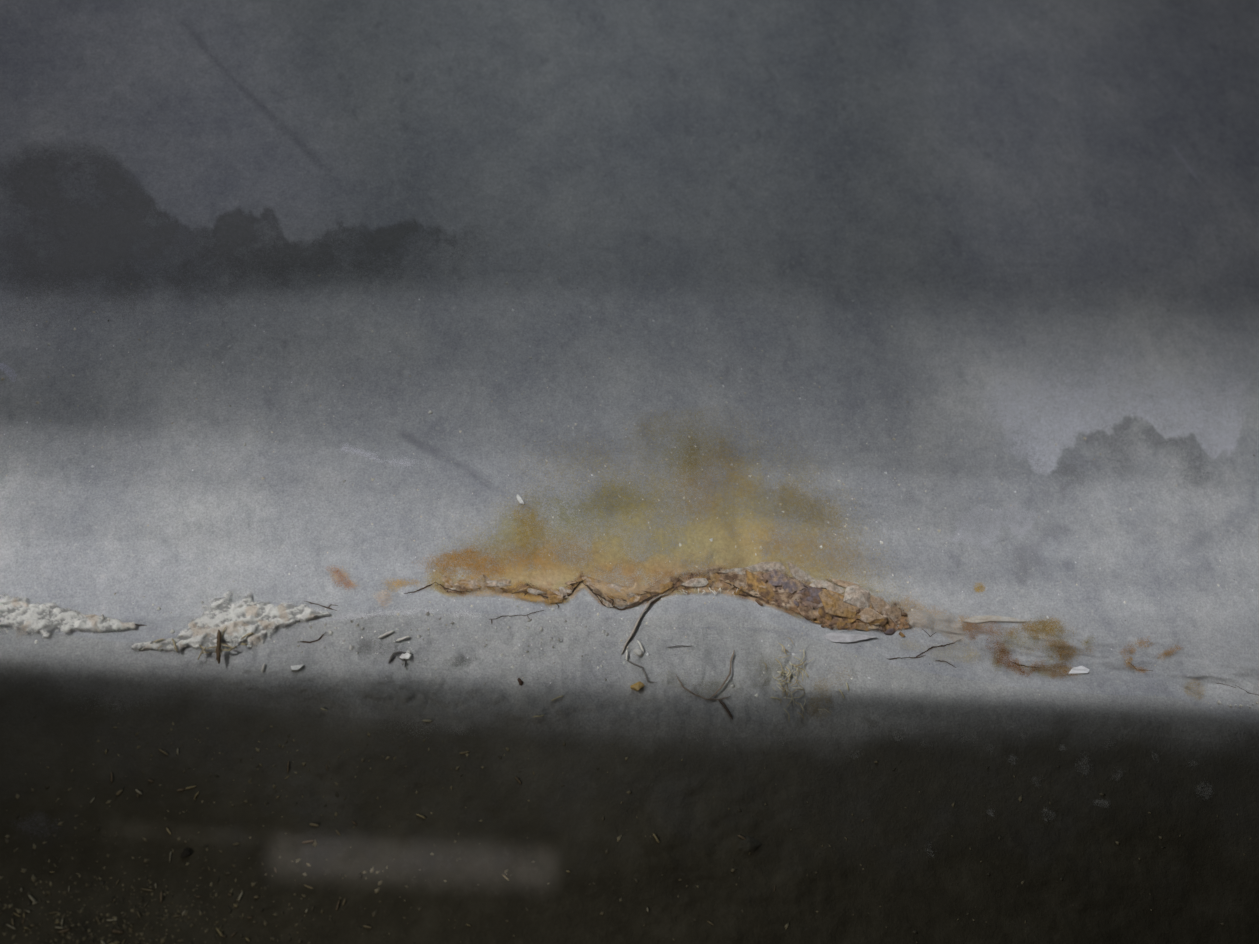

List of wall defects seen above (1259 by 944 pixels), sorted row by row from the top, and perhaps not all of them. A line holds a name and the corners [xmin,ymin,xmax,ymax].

water stain [0,134,501,338]
water stain [942,335,1254,588]
rust [380,559,1098,680]